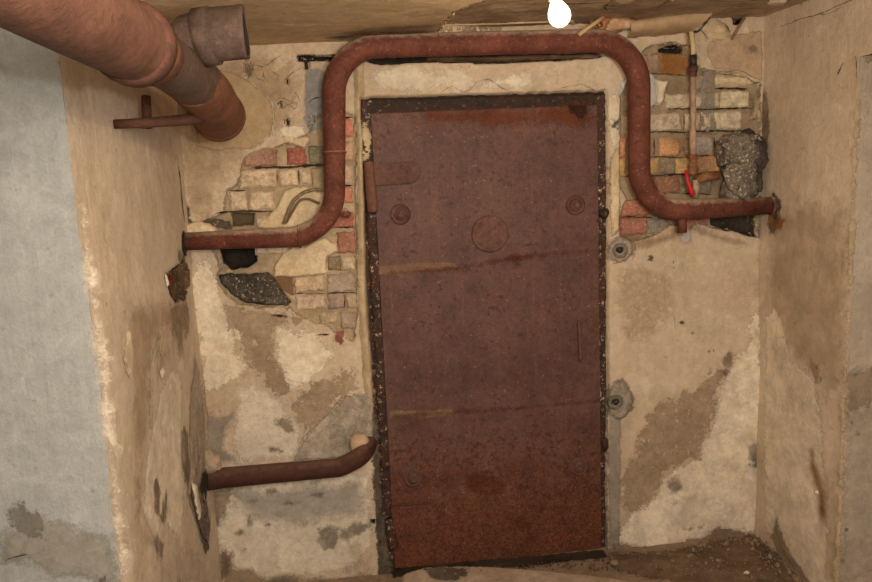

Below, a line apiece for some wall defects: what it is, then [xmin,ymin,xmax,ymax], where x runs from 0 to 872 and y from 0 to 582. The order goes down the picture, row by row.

flaking render [438,11,576,33]
flaking render [605,78,760,242]
flaking render [642,41,769,199]
flaking render [142,112,374,580]
damp [605,352,732,549]
damp [848,369,872,410]
damp [0,501,120,582]
damp [686,527,750,542]